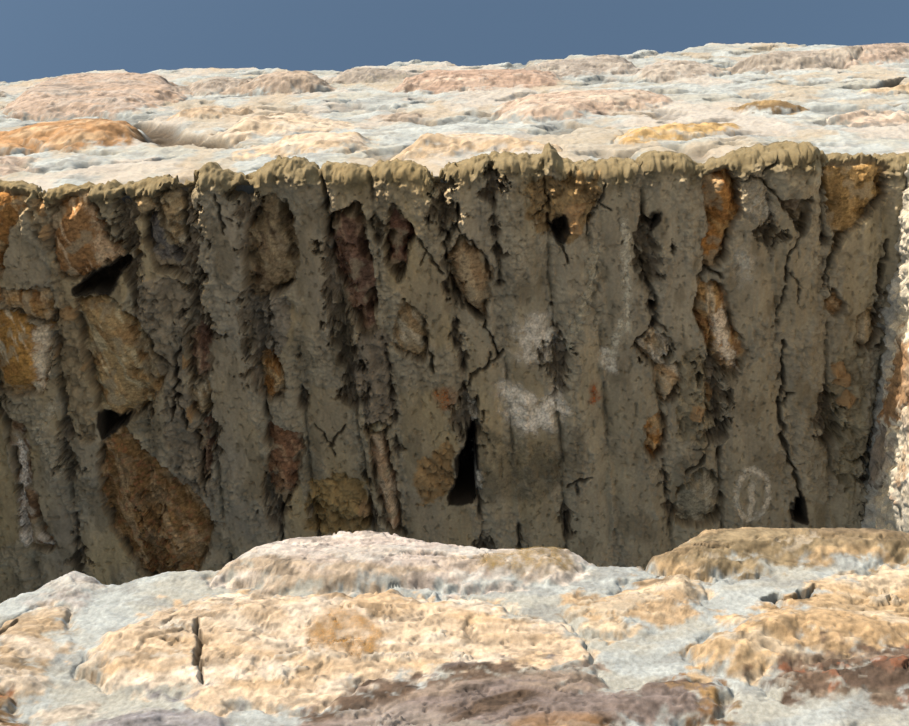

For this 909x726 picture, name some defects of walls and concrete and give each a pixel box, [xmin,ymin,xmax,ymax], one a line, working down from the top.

spalling [0,186,220,577]
spalling [239,192,302,405]
crack [313,423,347,457]
spalling [262,200,431,536]
crack [416,202,505,391]
crack [629,254,668,349]
spalling [631,164,750,464]
spalling [669,467,727,531]
crack [696,264,725,280]
crack [730,164,781,203]
crack [774,235,804,504]
spalling [780,153,890,253]